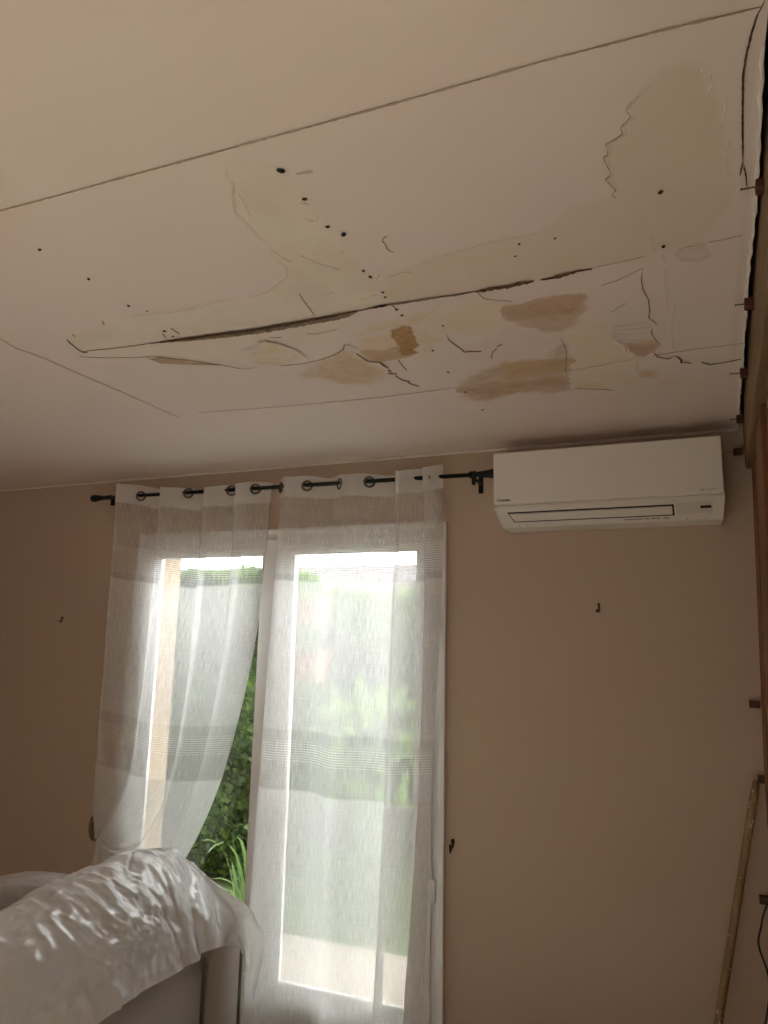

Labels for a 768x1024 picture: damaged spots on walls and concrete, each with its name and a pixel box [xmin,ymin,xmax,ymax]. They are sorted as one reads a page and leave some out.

crack [0,0,765,212]
leakage [285,301,452,389]
crack [0,256,745,417]
leakage [452,291,617,404]